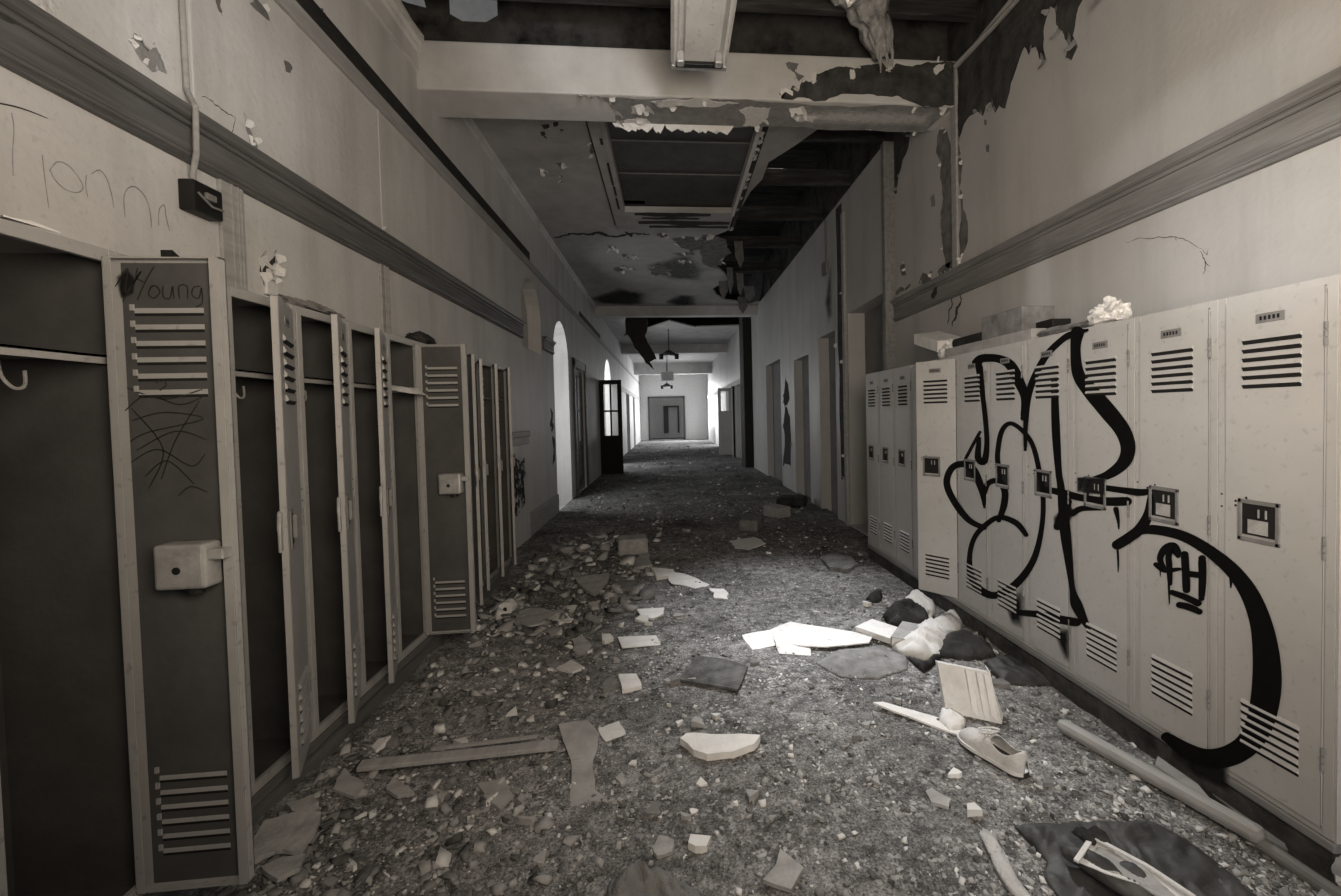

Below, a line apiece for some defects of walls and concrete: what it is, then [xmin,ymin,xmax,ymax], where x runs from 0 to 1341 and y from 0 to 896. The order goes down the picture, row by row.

peeling [250,0,270,21]
peeling [128,33,167,74]
peeling [576,0,1082,295]
peeling [1331,855,1341,886]